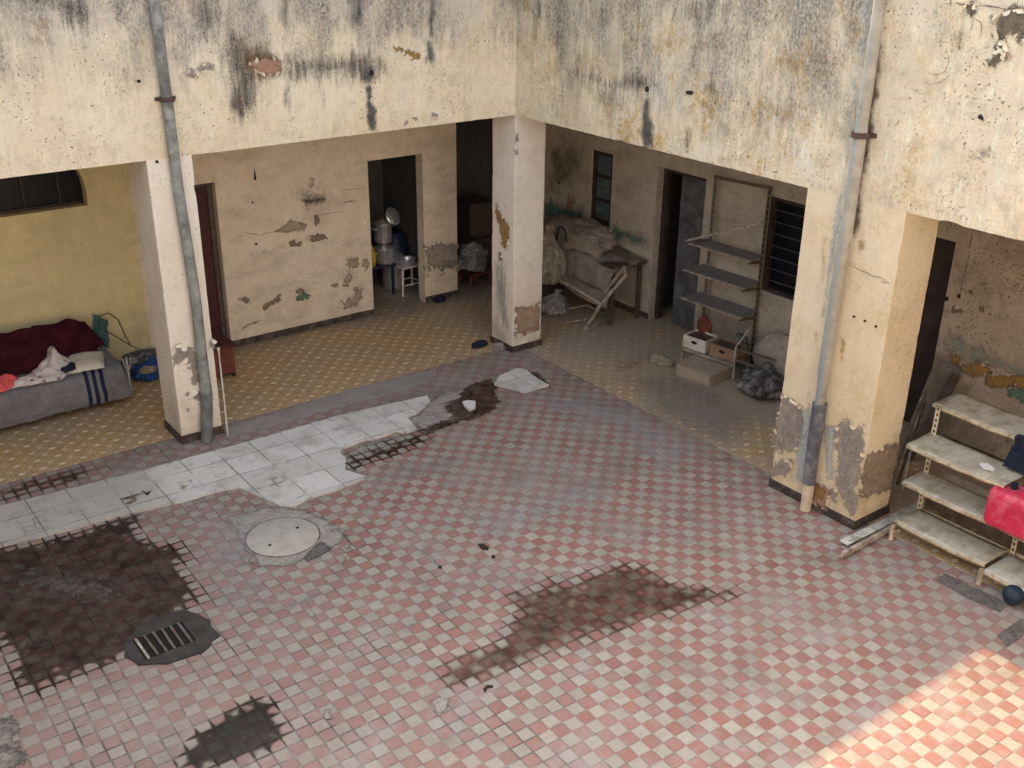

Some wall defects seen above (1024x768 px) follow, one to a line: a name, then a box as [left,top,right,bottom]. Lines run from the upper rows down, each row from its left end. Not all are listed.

peeling [964,0,1024,68]
water stain [226,34,256,117]
water stain [288,51,376,130]
water stain [620,78,653,148]
peeling [244,215,327,247]
peeling [495,203,511,263]
peeling [173,338,217,411]
peeling [771,392,803,477]
peeling [812,419,901,517]
water stain [0,494,209,696]
water stain [510,562,715,645]
water stain [173,696,292,768]